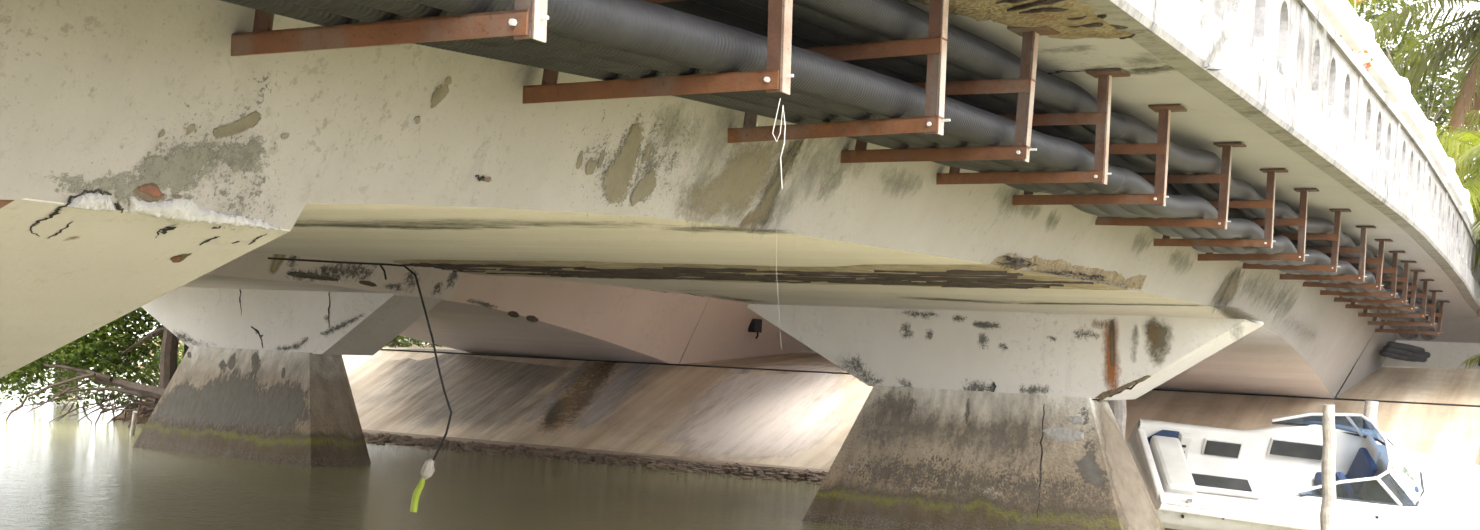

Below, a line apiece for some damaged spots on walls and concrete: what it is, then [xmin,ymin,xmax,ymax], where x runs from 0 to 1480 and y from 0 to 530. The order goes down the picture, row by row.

spalling [948,0,1135,40]
peeling [53,71,289,232]
damp [681,138,840,233]
crack [30,206,77,239]
crack [156,224,267,245]
damp [298,222,550,230]
damp [405,269,458,295]
spalling [359,252,1147,290]
damp [900,298,1012,350]
corrosion [1094,319,1170,389]
damp [1020,386,1049,395]